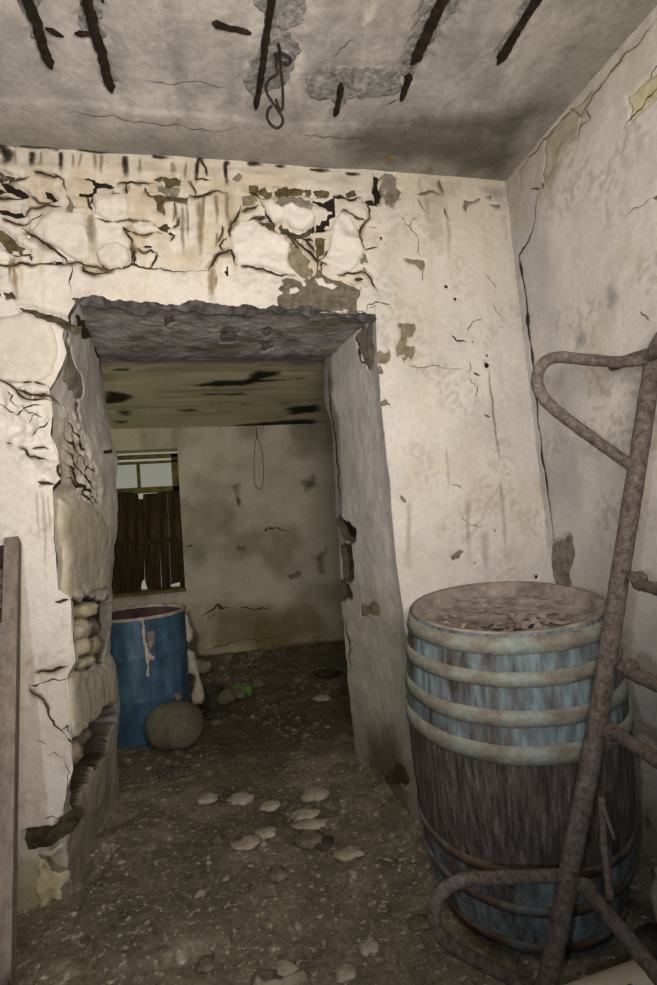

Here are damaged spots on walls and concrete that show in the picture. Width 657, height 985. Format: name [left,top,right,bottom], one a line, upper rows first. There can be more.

spalling [17,0,117,94]
spalling [212,0,307,110]
spalling [305,0,461,117]
spalling [496,0,542,66]
spalling [0,169,30,199]
spalling [0,230,32,257]
spalling [45,178,115,213]
spalling [72,173,416,375]
crack [519,18,657,368]
crack [408,275,499,417]
crack [0,379,98,509]
crack [535,397,557,542]